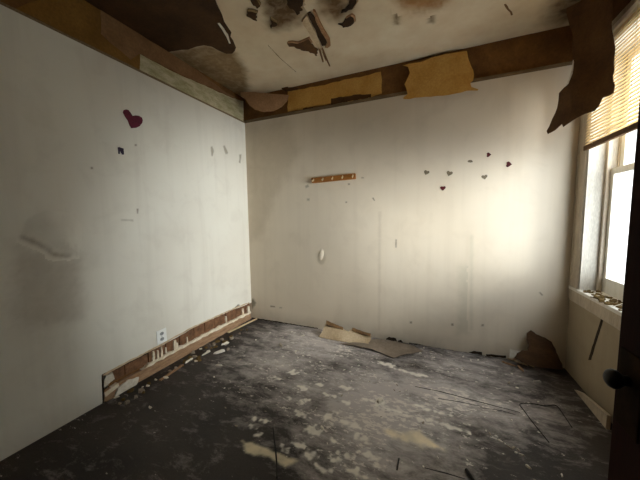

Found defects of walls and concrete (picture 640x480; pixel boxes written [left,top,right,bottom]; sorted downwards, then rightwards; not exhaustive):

peeling [247,0,261,21]
spalling [287,0,331,66]
peeling [338,0,358,28]
flaking render [102,302,251,403]